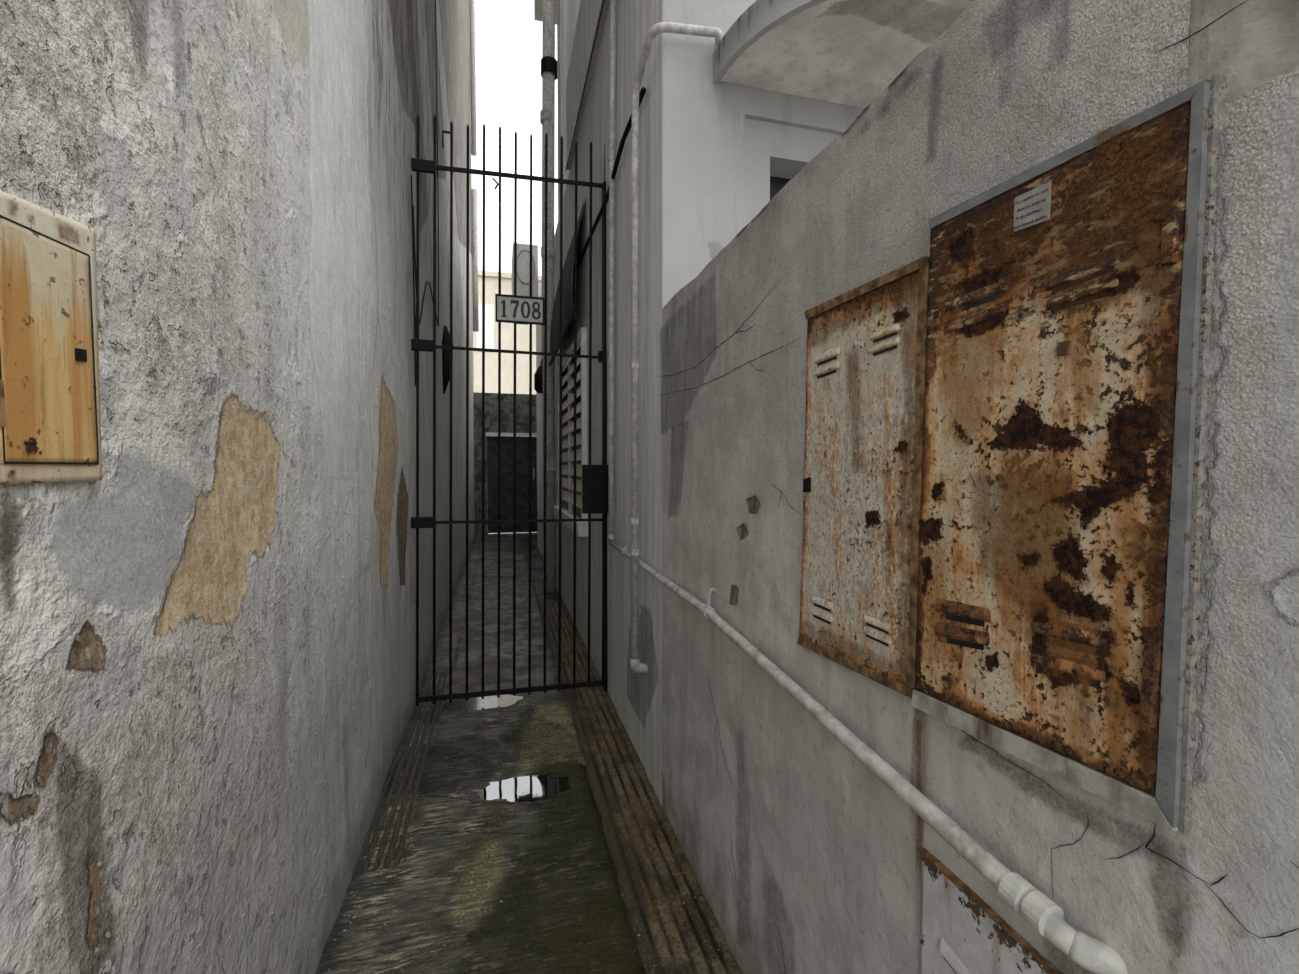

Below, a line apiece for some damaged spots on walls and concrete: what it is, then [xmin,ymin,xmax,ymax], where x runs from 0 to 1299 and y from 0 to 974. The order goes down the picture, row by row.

crack [1155,0,1248,53]
spalling [153,394,281,636]
spalling [375,375,409,587]
spalling [736,495,760,540]
spalling [66,621,107,672]
spalling [0,724,59,825]
corrosion [913,708,923,787]
crack [1051,819,1089,897]
crack [1110,823,1299,938]